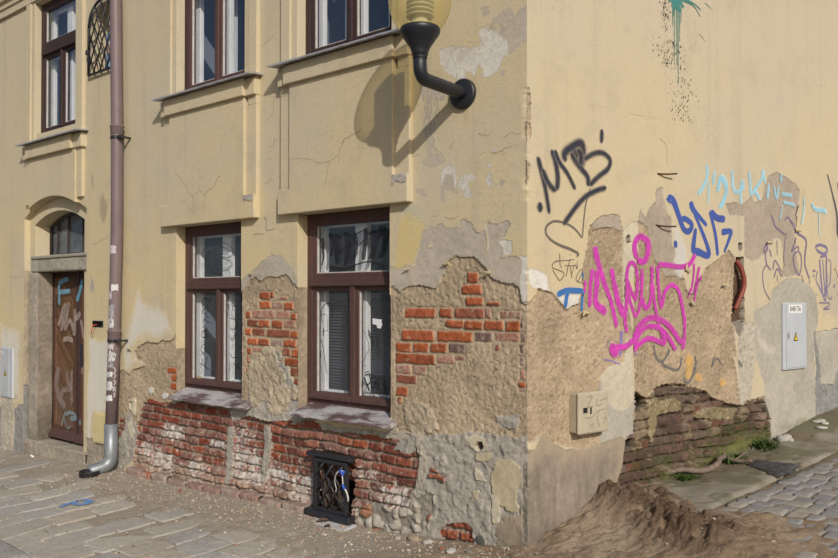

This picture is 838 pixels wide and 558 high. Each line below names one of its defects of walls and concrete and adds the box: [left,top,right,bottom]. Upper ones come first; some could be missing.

peeling [438,5,527,80]
flaking render [726,172,801,278]
flaking render [113,187,772,547]